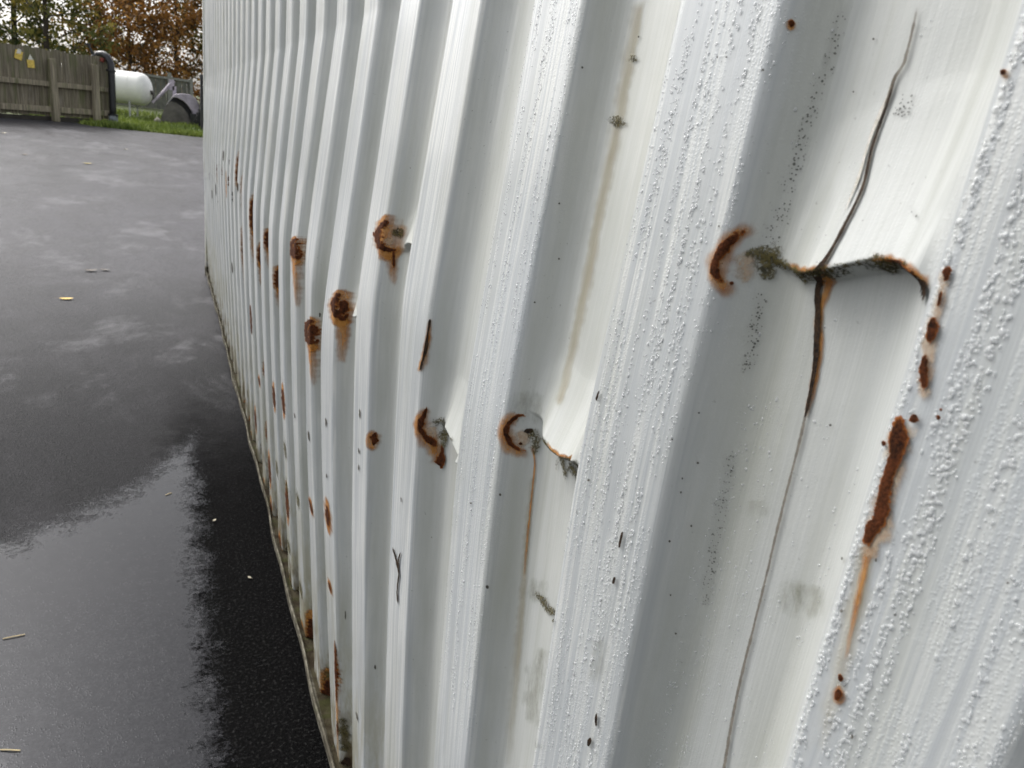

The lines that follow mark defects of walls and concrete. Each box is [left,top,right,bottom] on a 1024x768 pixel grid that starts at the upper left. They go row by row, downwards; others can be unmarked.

corrosion [290,236,307,293]
corrosion [372,214,403,272]
corrosion [709,228,754,293]
corrosion [304,290,353,373]
corrosion [918,266,952,397]
crack [722,15,916,768]
corrosion [414,407,446,469]
corrosion [498,414,536,562]
corrosion [851,414,919,630]